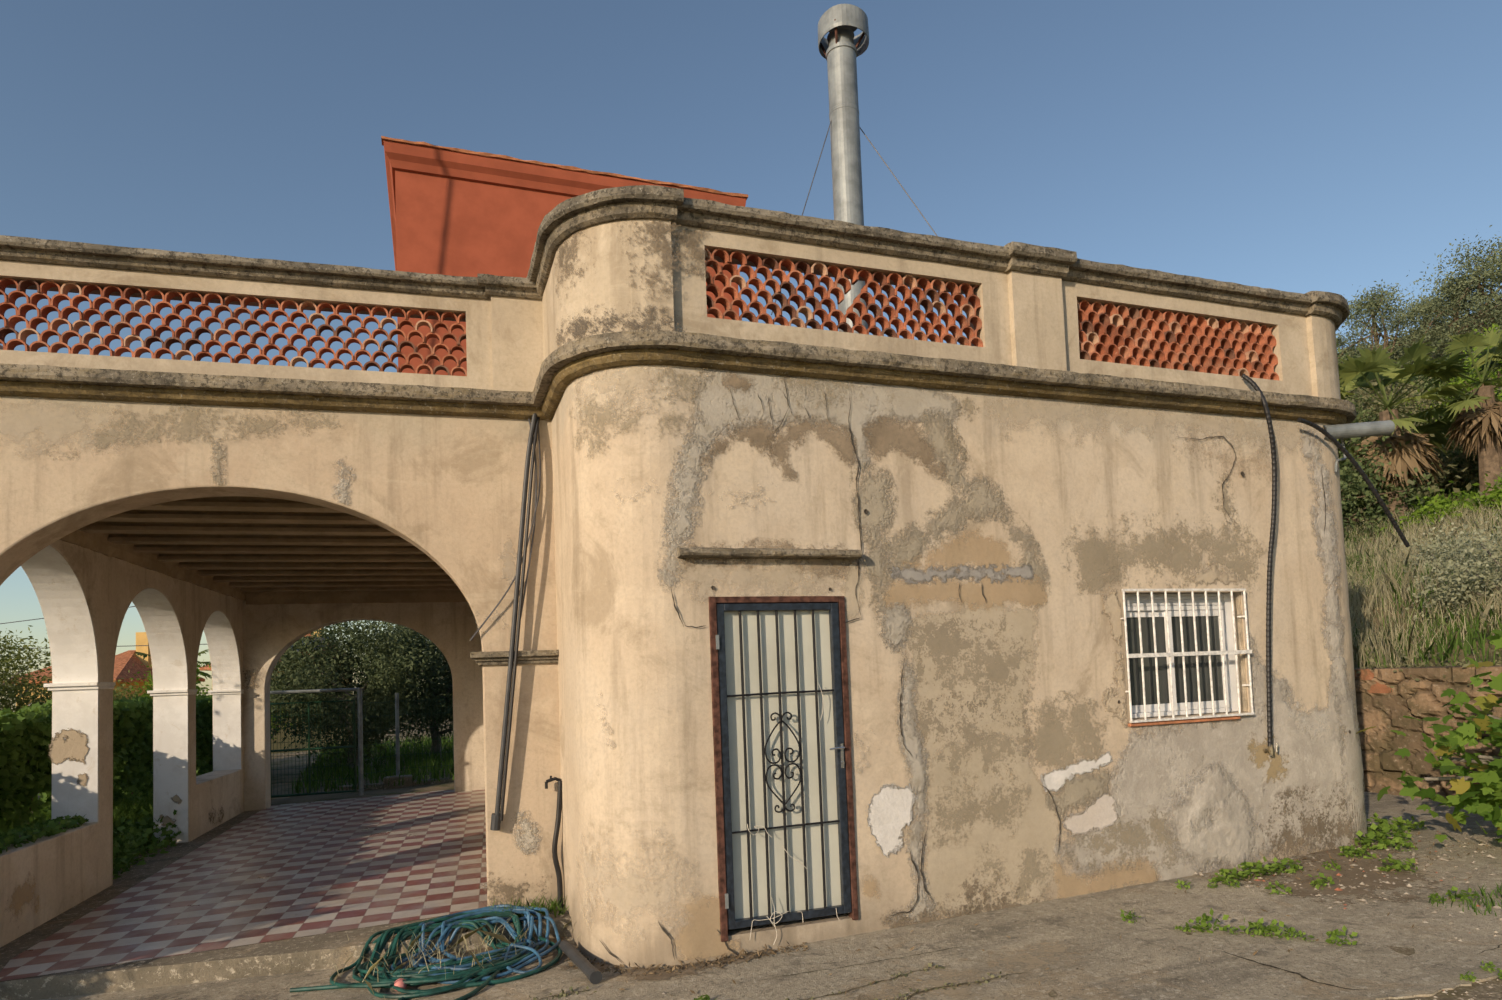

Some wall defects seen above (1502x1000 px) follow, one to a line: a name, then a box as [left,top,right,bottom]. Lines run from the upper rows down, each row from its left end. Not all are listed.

crack [730,376,862,623]
flaking render [843,564,863,618]
peeling [48,728,89,786]
peeling [867,782,918,857]
crack [889,658,936,923]
peeling [1040,751,1113,792]
peeling [1062,793,1118,835]